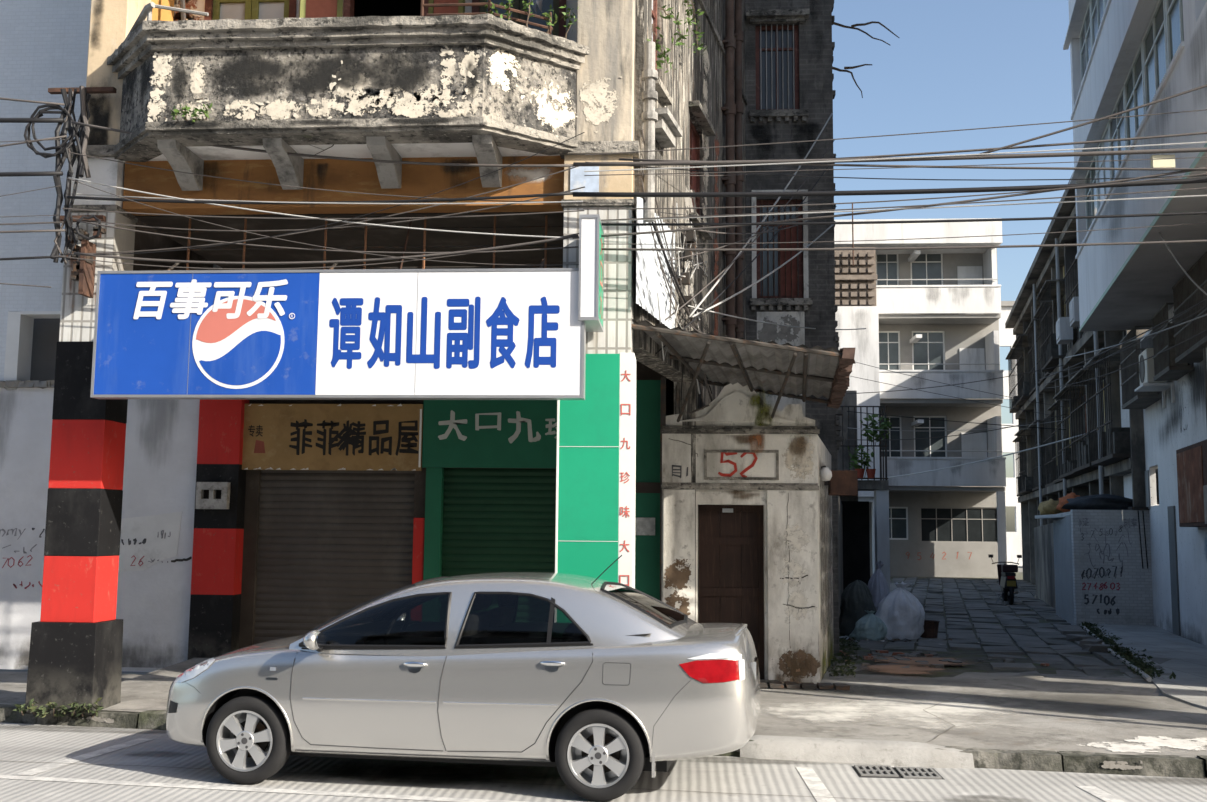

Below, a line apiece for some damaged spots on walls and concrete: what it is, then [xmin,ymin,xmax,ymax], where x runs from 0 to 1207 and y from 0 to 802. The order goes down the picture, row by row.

damp [92,0,102,43]
damp [126,63,148,105]
mould [174,69,187,95]
mould [220,55,427,95]
peeling [147,45,623,133]
mould [467,63,477,94]
damp [87,95,110,145]